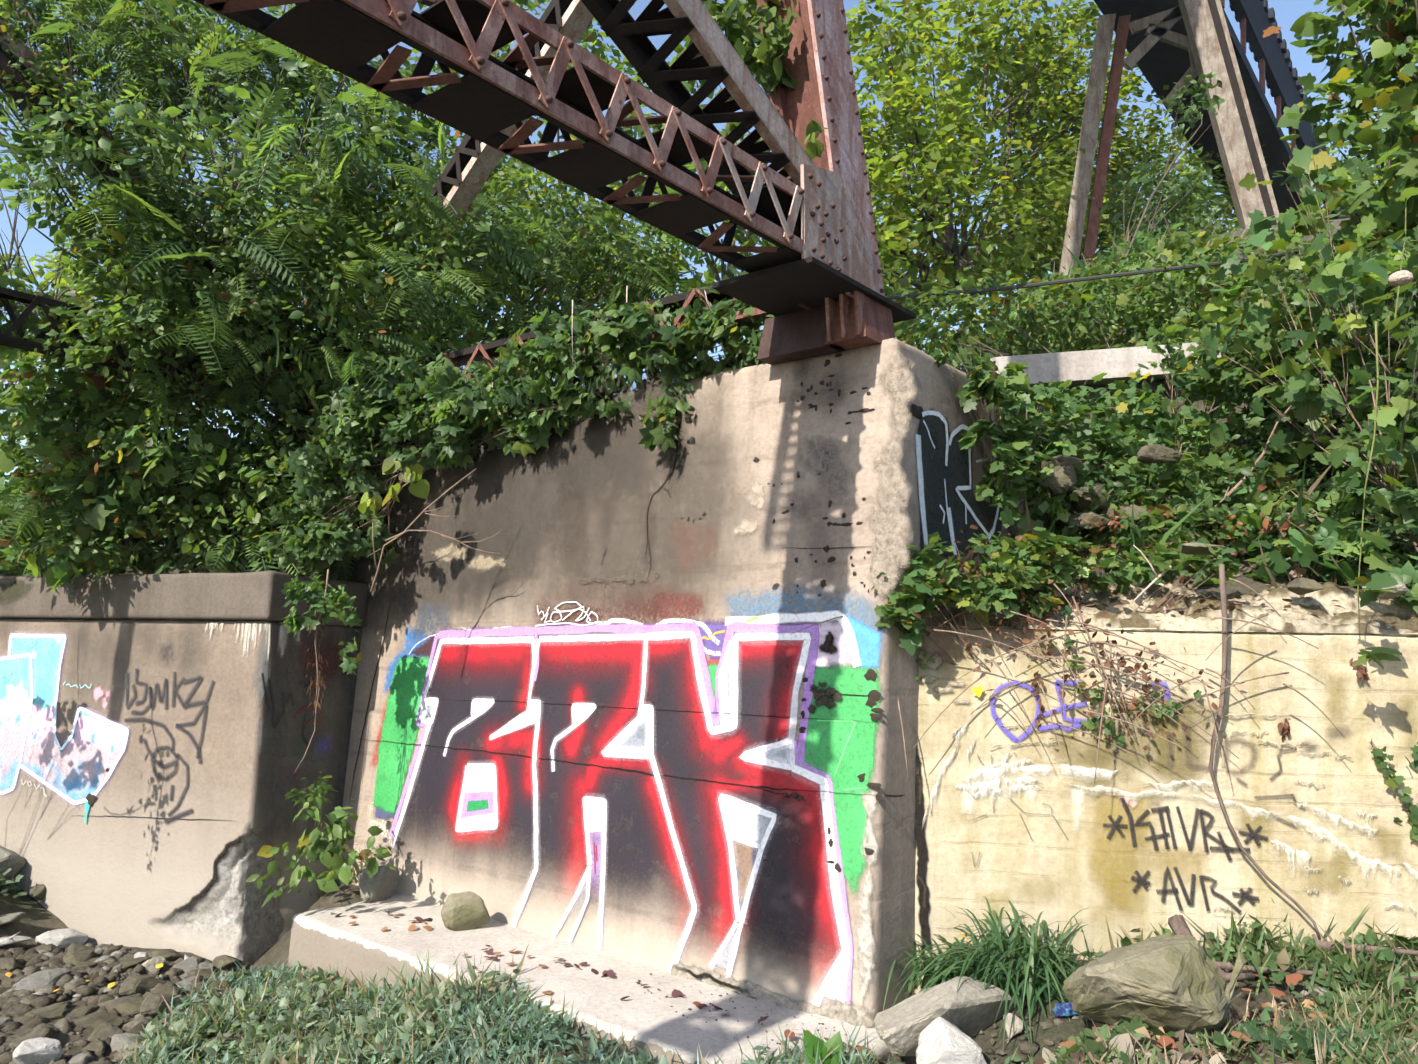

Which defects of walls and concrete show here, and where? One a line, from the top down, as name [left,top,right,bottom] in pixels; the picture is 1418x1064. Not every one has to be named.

crack [644,420,681,563]
spalling [165,824,284,968]
crack [887,745,931,949]
leakage [922,704,1418,885]
leakage [1269,838,1322,895]